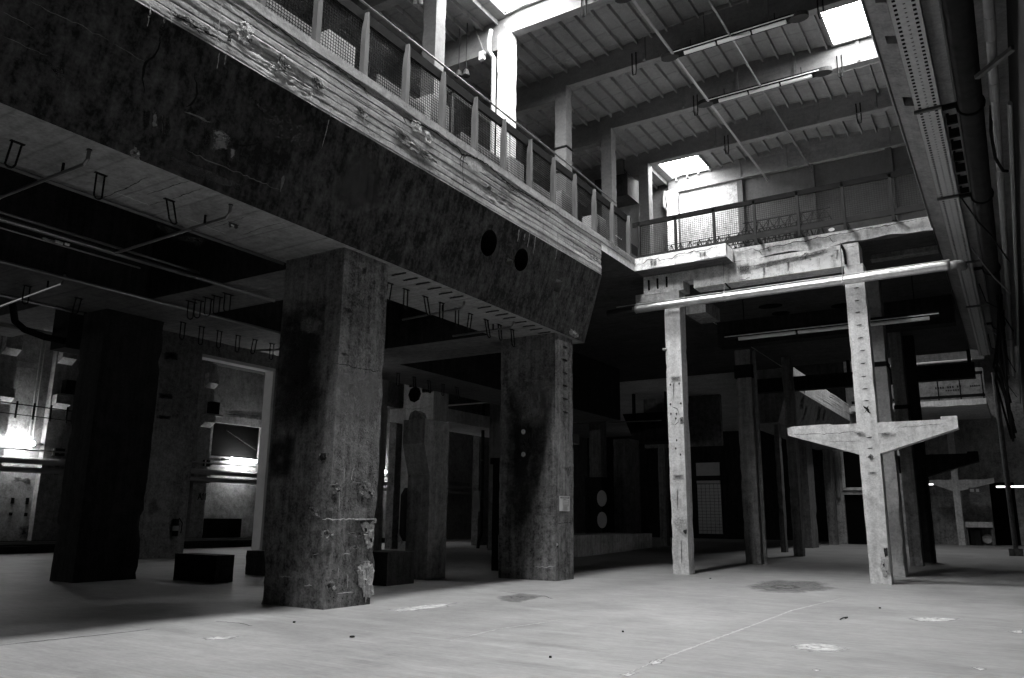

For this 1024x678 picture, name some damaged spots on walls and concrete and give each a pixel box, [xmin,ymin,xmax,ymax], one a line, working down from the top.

spalling [311,75,324,90]
spalling [309,507,375,603]